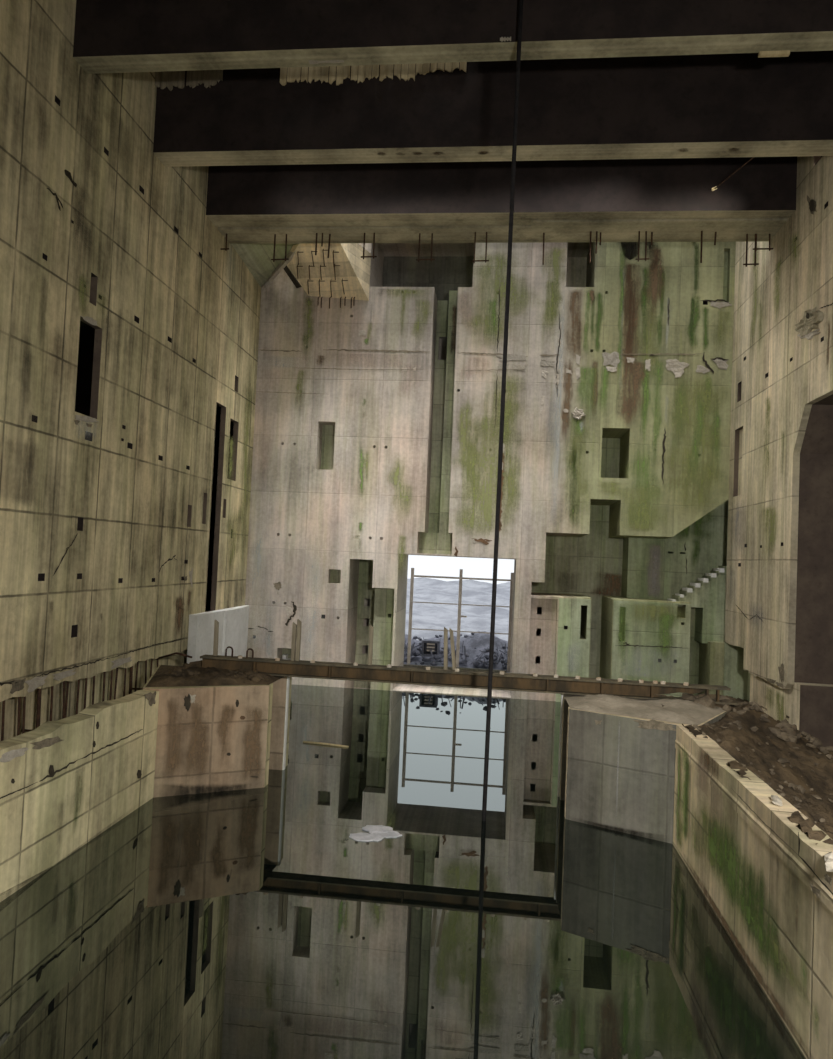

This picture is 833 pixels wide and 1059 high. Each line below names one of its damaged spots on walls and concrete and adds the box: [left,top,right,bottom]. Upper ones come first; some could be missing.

leakage [475,256,527,335]
spalling [540,314,581,415]
corrosion [562,290,594,433]
spalling [602,351,651,372]
corrosion [621,249,663,422]
spalling [666,359,729,378]
corrosion [470,444,505,547]
leakage [459,379,517,532]
crack [659,429,667,483]
crack [53,533,78,576]
spalling [0,652,192,763]
leakage [676,751,696,849]